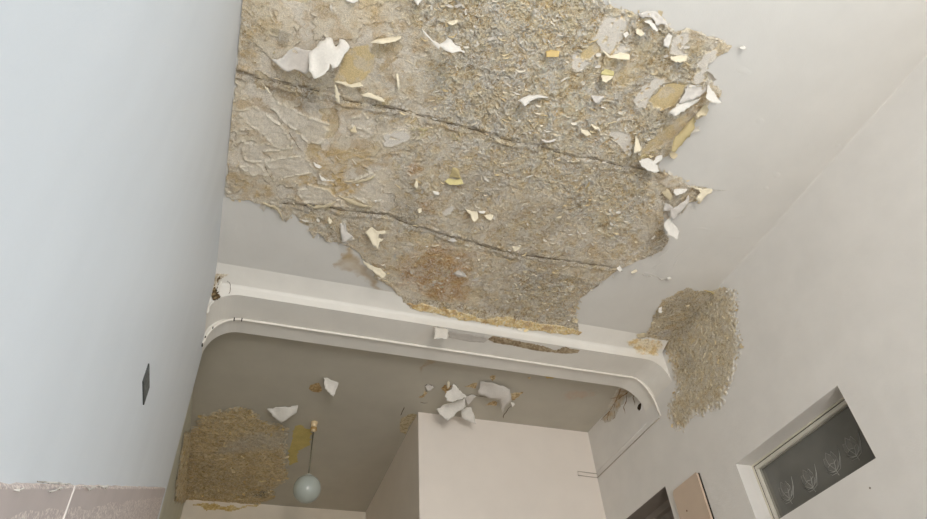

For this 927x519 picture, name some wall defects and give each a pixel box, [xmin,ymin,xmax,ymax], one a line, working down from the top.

peeling [224,0,746,354]
spalling [309,378,338,397]
peeling [419,375,523,424]
peeling [625,287,745,433]
peeling [174,405,298,512]